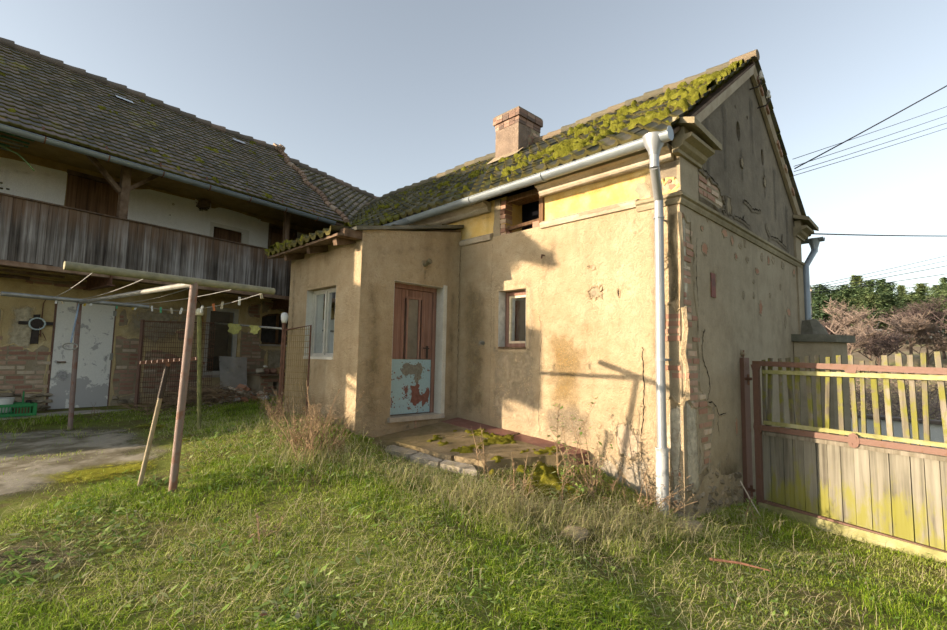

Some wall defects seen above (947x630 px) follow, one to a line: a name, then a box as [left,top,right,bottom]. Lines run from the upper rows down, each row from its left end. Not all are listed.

flaking render [661,177,680,195]
flaking render [0,307,67,395]
peeling [390,362,430,430]
damp [555,339,577,399]
flaking render [613,420,642,461]
crack [633,346,647,483]
flaking render [664,168,733,478]